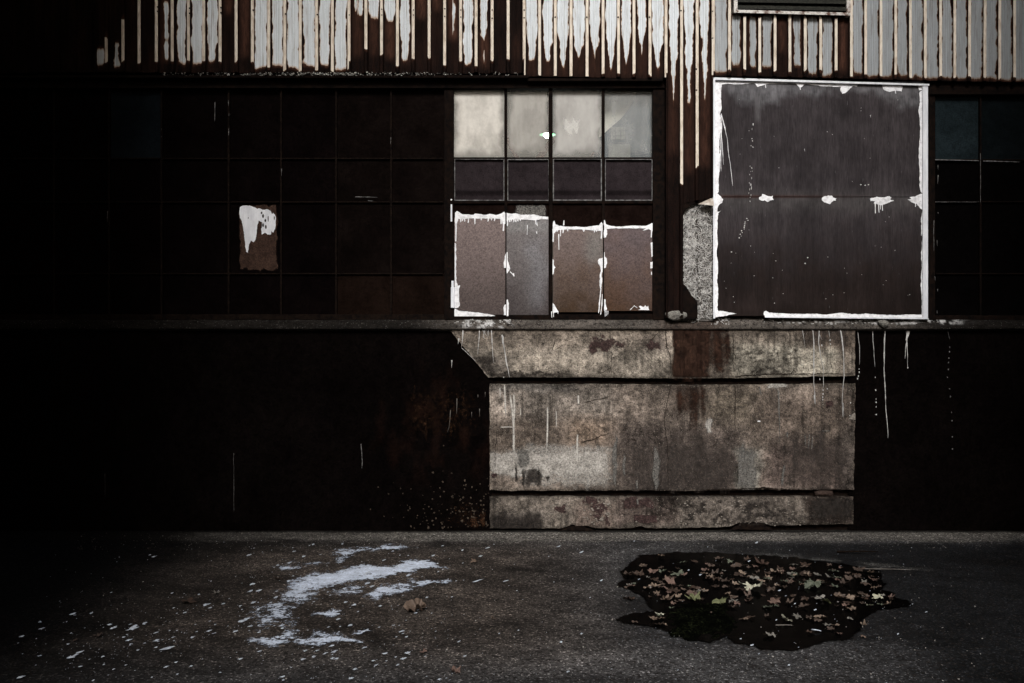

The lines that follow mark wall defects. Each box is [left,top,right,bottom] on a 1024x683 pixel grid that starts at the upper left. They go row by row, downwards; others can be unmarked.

peeling [239,205,276,253]
rust [672,330,731,426]
leakage [458,338,610,486]
leakage [634,445,757,488]
leakage [490,511,543,528]